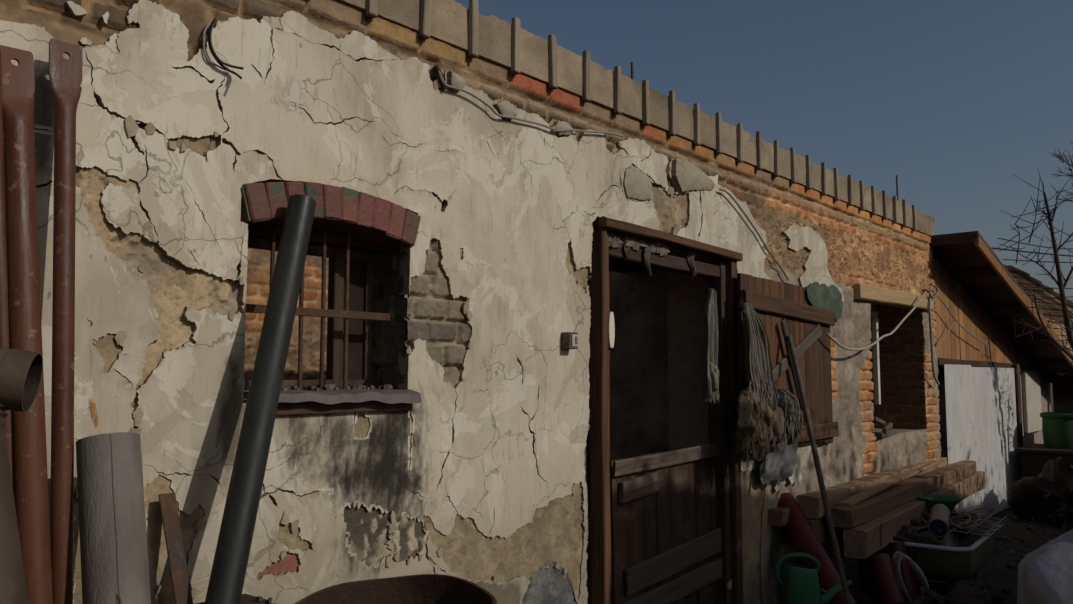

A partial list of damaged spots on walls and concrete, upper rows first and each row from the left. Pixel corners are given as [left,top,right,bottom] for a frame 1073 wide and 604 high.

crack [94,96,146,145]
flaking render [0,0,941,506]
peeling [73,487,83,604]
peeling [144,472,206,604]
peeling [257,511,316,579]
peeling [343,483,585,604]
peeling [727,470,798,604]